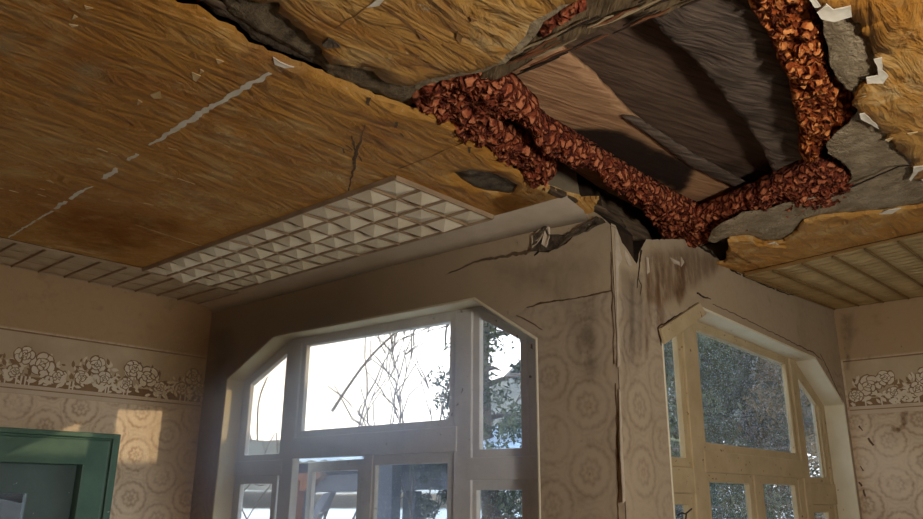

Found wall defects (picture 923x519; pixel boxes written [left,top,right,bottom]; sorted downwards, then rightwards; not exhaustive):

peeling [335,0,431,42]
peeling [415,3,571,90]
peeling [810,0,888,94]
peeling [148,72,272,151]
crack [196,0,416,191]
spalling [455,170,516,193]
peeling [708,110,923,245]
peeling [8,186,144,268]
crack [449,237,572,273]